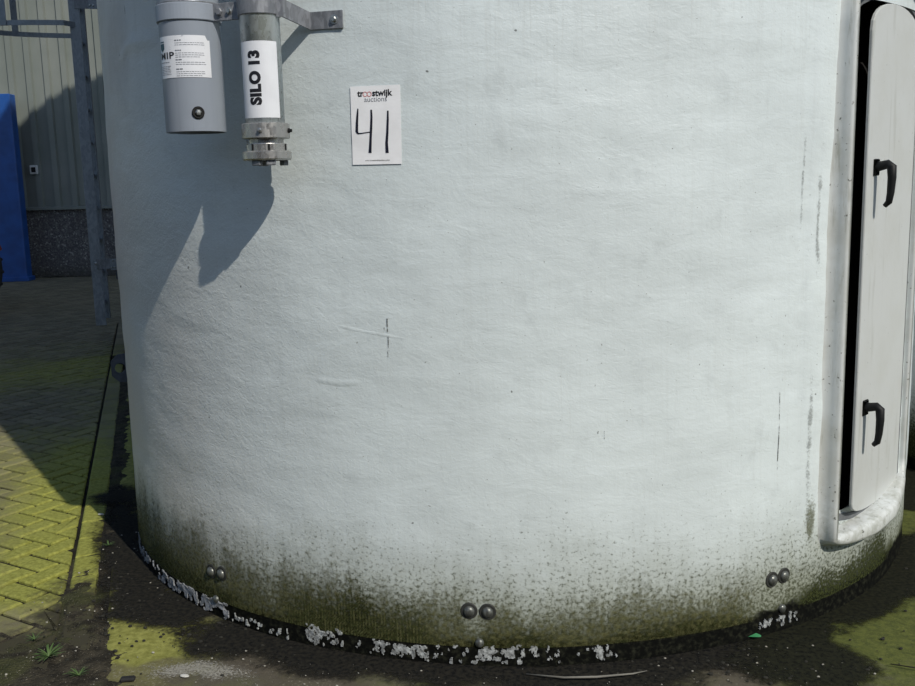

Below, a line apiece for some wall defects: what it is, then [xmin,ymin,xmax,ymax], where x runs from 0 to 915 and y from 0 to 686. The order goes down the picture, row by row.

leakage [89,485,915,686]